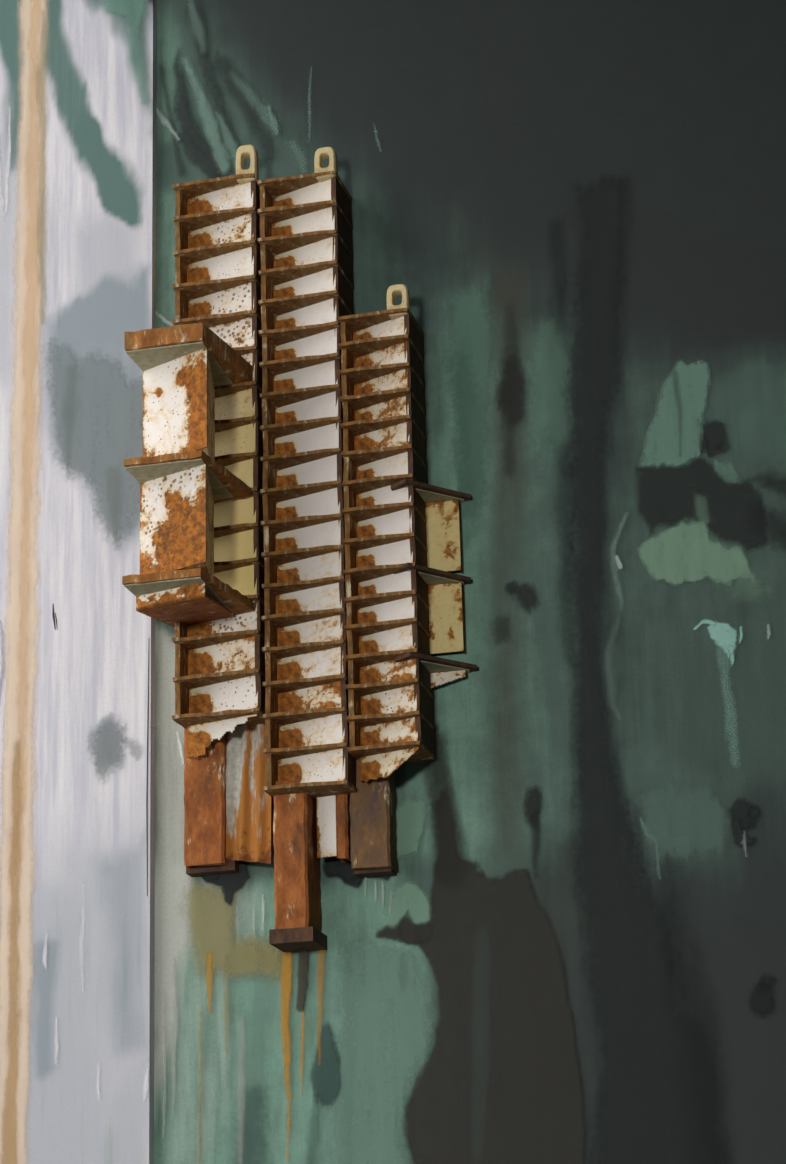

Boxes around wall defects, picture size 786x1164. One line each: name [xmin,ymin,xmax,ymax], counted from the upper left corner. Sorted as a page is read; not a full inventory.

water stain [48,343,143,532]
water stain [93,721,123,775]
water stain [310,179,786,1164]
water stain [201,863,249,905]
rust [188,886,304,1160]